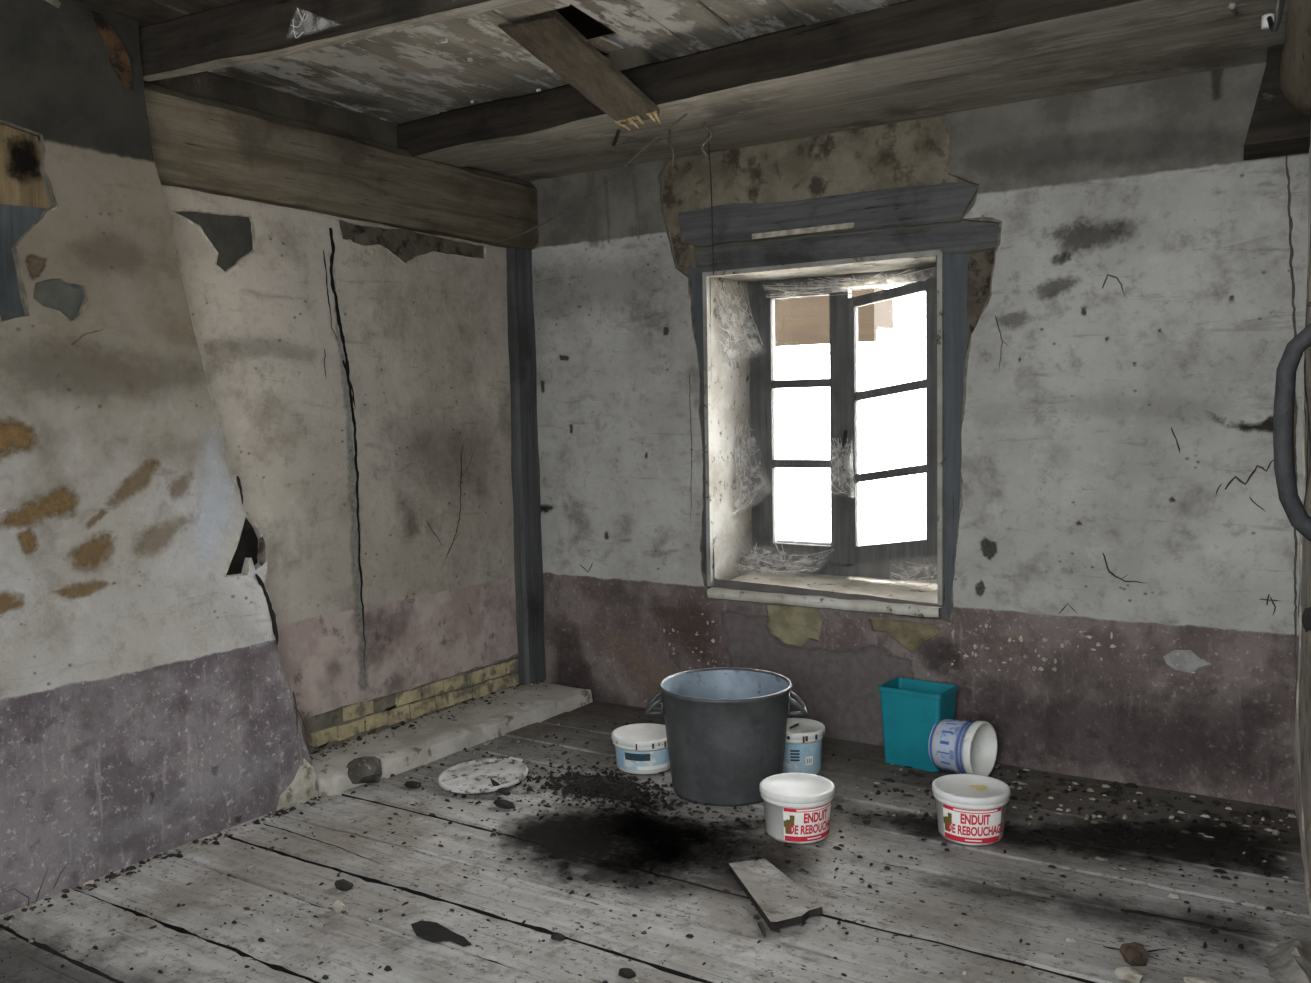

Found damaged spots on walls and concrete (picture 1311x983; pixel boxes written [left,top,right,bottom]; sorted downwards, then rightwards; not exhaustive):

spalling [0,120,89,323]
flaking render [172,208,256,273]
spalling [339,219,487,267]
damp [1043,280,1069,296]
damp [1053,222,1129,263]
spalling [224,512,266,578]
crack [293,228,444,749]
spalling [658,115,1116,671]
crack [1216,155,1311,719]
flaking render [1302,346,1311,517]
peeling [1163,650,1219,676]
flaking render [1296,535,1311,912]